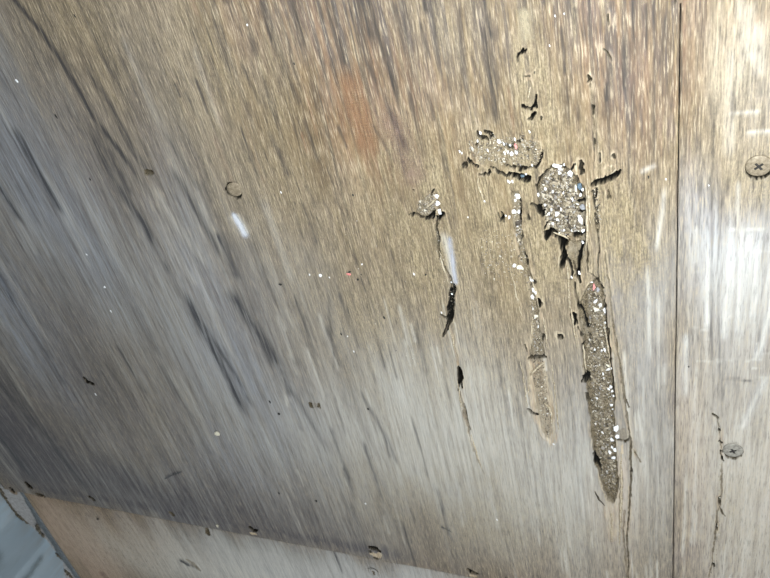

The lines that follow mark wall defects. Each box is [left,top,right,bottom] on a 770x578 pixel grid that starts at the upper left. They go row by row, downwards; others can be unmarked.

spalling [456,122,561,449]
spalling [566,269,626,545]
crack [703,409,731,578]